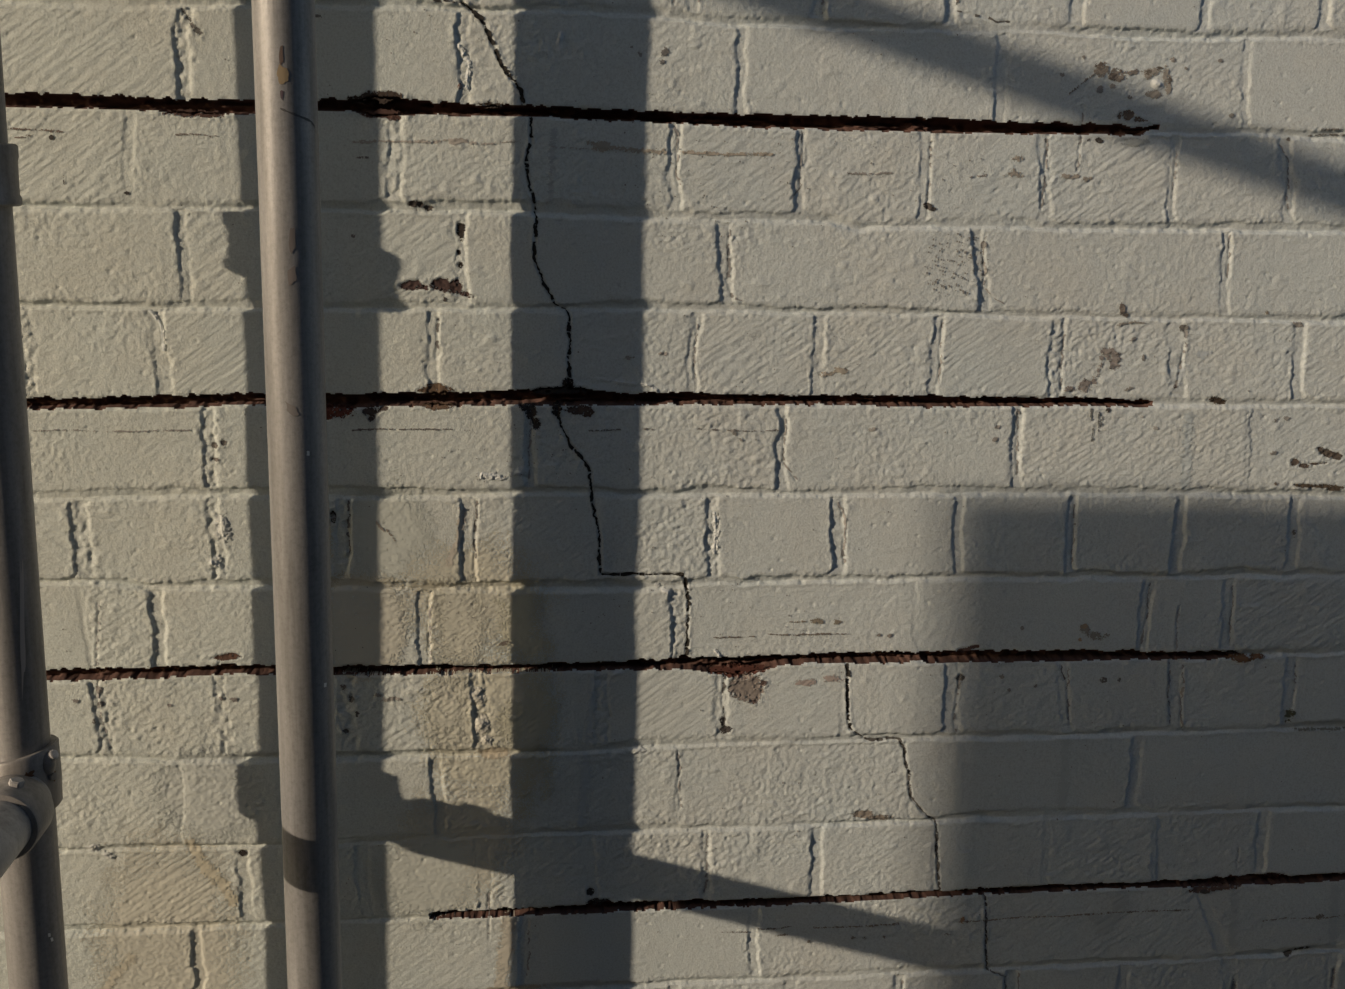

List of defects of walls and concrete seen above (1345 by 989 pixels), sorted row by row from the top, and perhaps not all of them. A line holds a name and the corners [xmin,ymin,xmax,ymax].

crack [956,0,1010,23]
peeling [1060,55,1188,122]
crack [1041,113,1084,208]
spalling [400,223,474,302]
crack [726,233,742,301]
crack [434,0,691,656]
crack [1058,326,1066,387]
spalling [708,661,767,704]
crack [1140,583,1185,730]
spalling [719,716,733,734]
crack [845,663,941,890]
crack [979,887,1020,989]